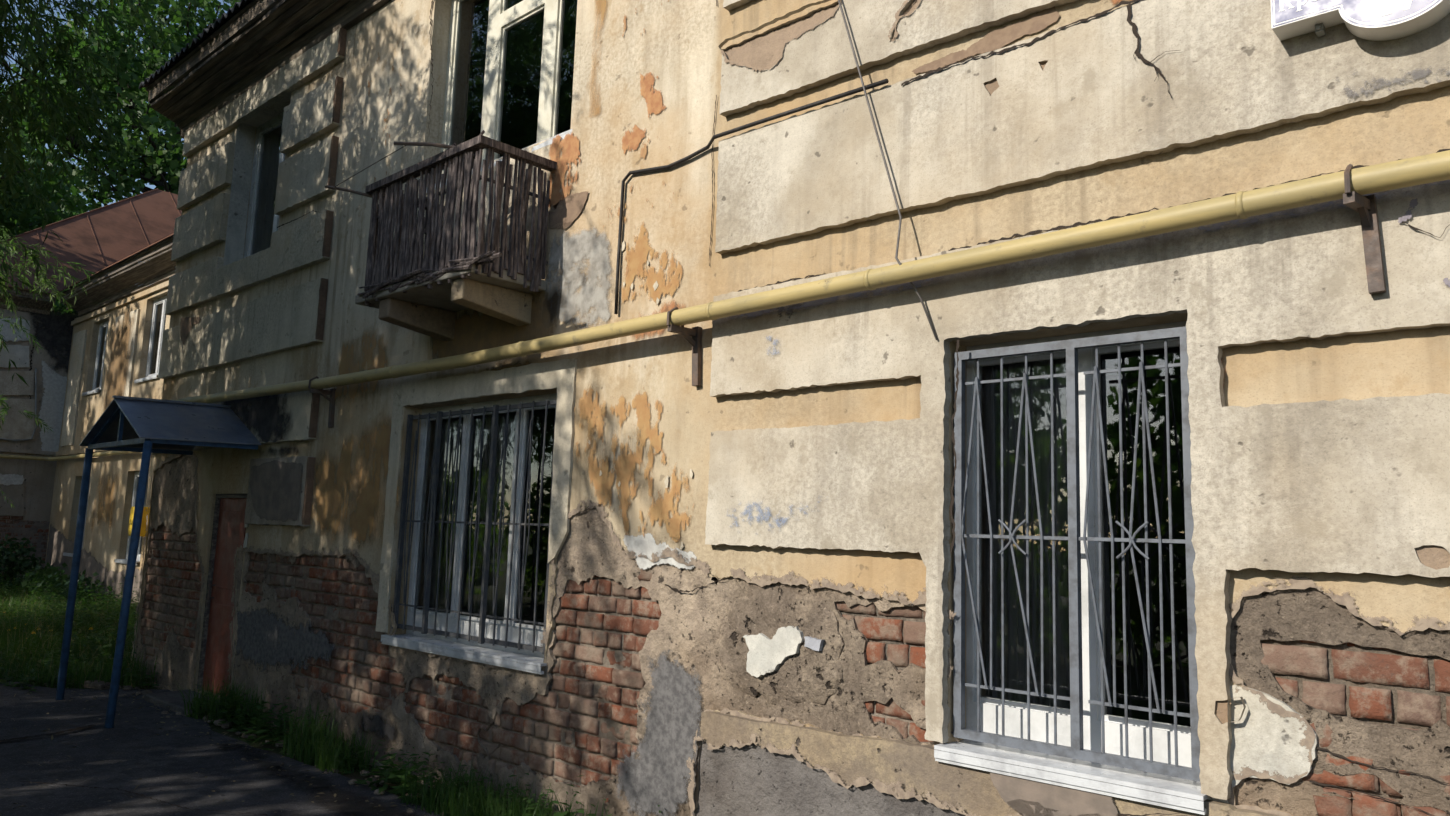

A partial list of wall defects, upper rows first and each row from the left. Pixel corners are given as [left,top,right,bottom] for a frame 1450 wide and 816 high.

flaking render [720,1,842,71]
spalling [888,0,921,41]
flaking render [912,6,1060,74]
crack [901,0,1179,98]
peeling [622,72,670,159]
peeling [549,133,589,229]
peeling [603,185,683,305]
flaking render [0,452,204,691]
flaking render [227,385,981,816]
flaking render [1208,576,1450,816]
flaking render [990,772,1118,816]